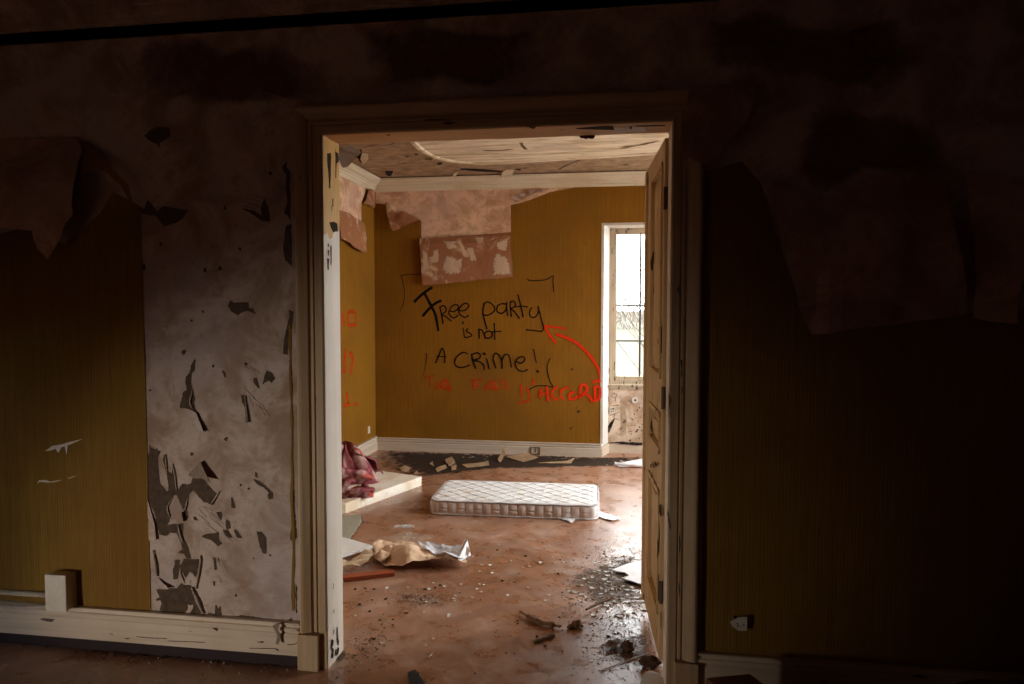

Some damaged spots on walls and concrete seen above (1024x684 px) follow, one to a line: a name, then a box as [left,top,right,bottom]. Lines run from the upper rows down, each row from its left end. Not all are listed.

flaking render [327,146,574,238]
flaking render [228,301,256,315]
flaking render [253,371,275,388]
flaking render [180,358,206,432]
flaking render [241,395,251,423]
flaking render [254,472,273,500]
flaking render [147,445,242,615]
flaking render [257,532,267,554]